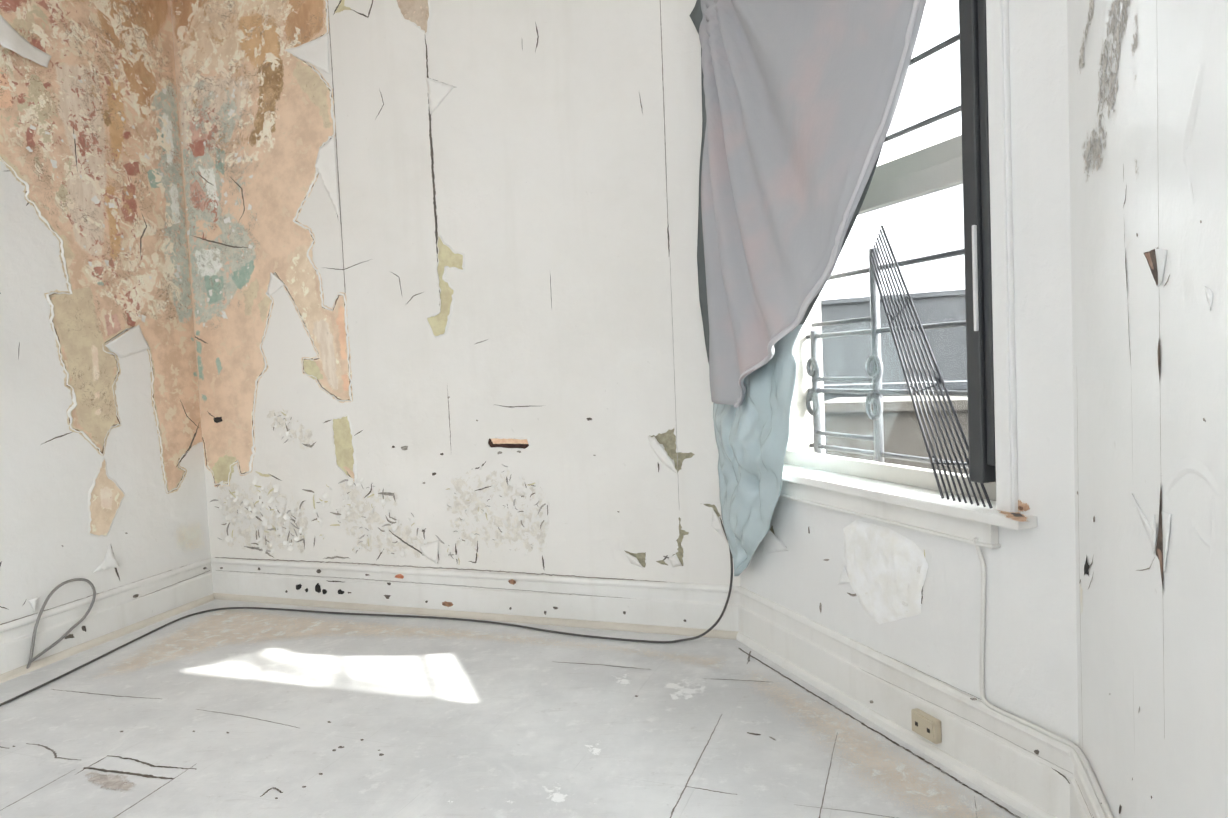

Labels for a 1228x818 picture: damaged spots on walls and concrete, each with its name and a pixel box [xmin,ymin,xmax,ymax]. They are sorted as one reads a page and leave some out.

peeling [0,0,549,594]
peeling [1077,0,1138,180]